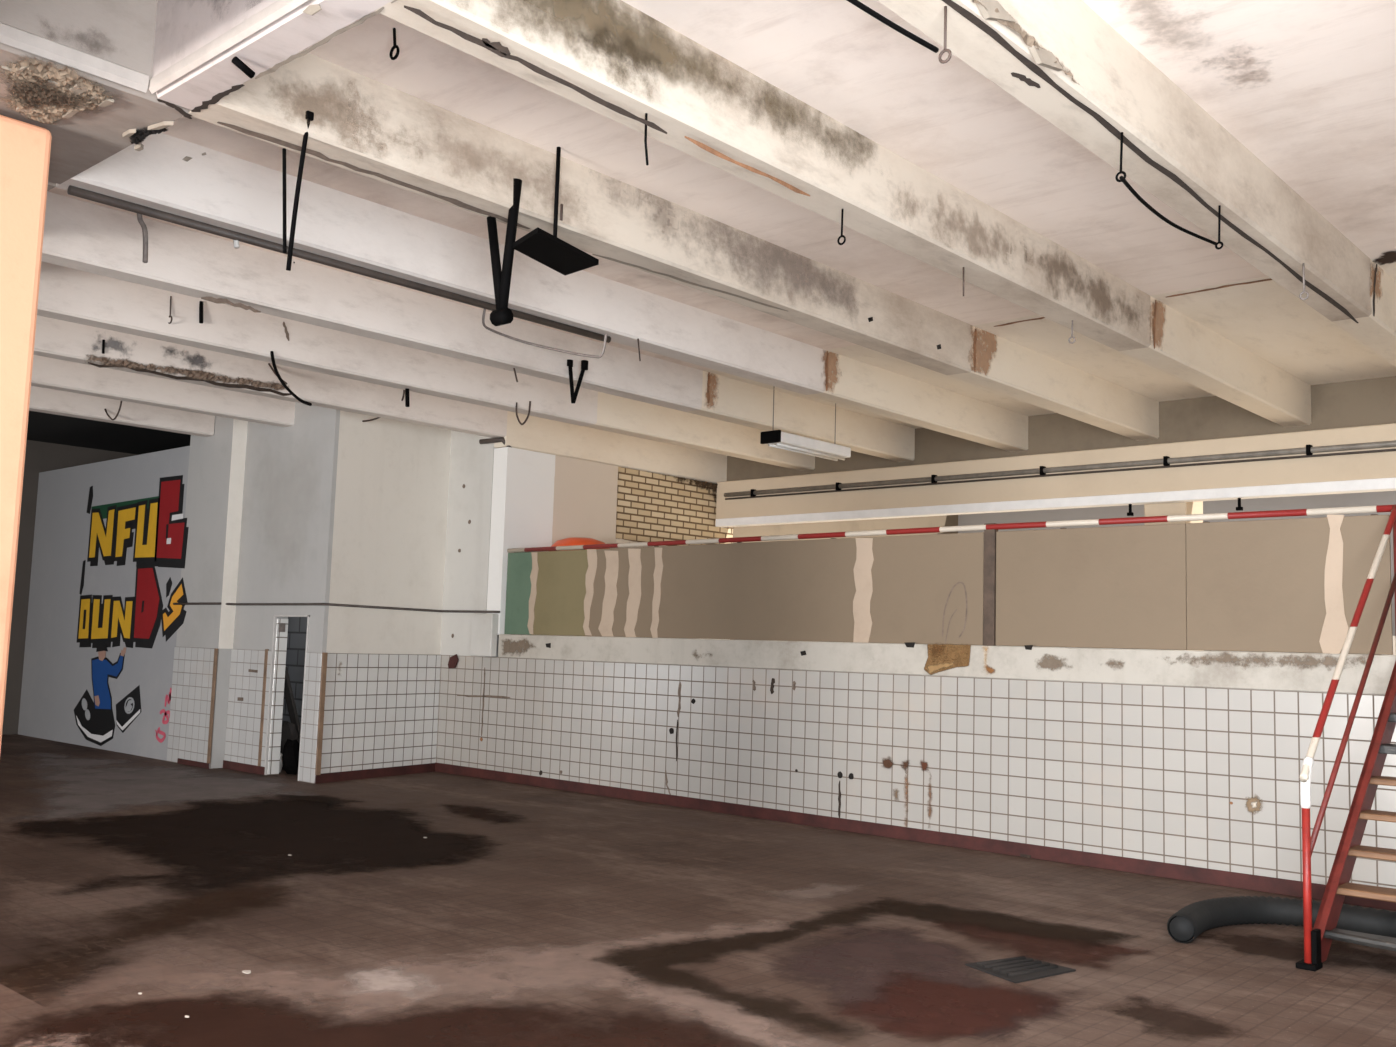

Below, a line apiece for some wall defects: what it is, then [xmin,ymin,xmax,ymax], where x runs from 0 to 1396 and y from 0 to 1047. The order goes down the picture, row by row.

water stain [513,0,738,93]
spalling [0,56,114,124]
water stain [755,91,869,154]
water stain [723,227,850,305]
water stain [1026,255,1137,320]
crack [1373,251,1396,265]
spalling [904,642,971,675]
water stain [0,795,517,999]
water stain [785,884,856,898]
water stain [775,921,1141,1040]